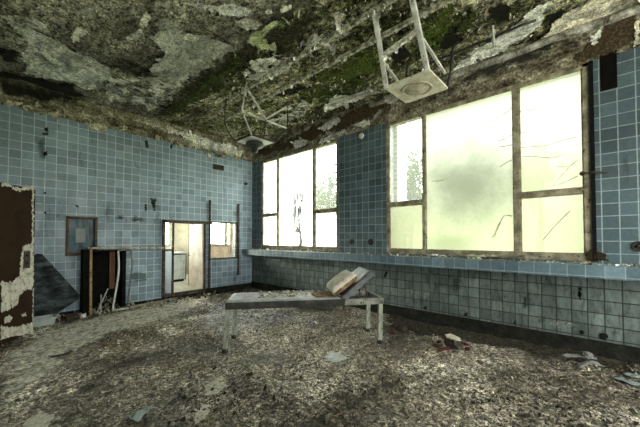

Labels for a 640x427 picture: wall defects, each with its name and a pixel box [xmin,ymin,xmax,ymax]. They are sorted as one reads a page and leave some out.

leakage [0,48,21,63]
leakage [0,72,86,104]
peeling [0,6,237,119]
leakage [162,3,332,109]
peeling [168,0,640,160]
peeling [0,182,35,340]
corrosion [586,249,609,262]